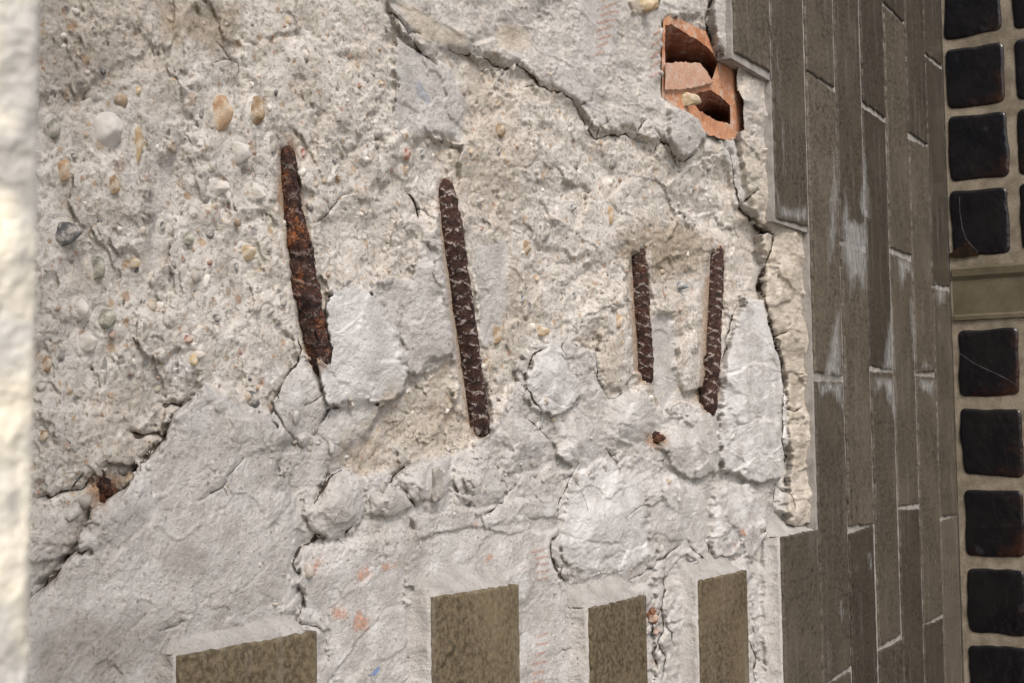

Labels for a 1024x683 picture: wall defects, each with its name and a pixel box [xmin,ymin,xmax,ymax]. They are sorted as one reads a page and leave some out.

crack [387,11,693,165]
crack [724,145,800,508]
crack [37,475,94,499]
crack [118,400,189,492]
crack [32,523,88,596]
crack [629,544,709,675]